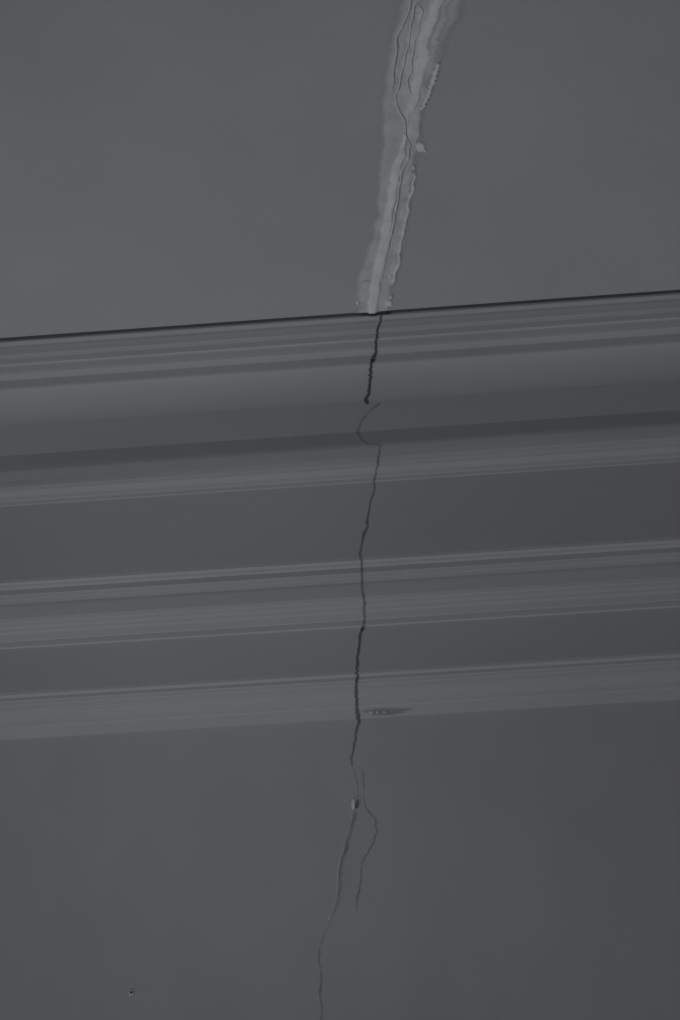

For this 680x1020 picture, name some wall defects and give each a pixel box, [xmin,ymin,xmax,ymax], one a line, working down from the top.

water stain [407,0,445,114]
water stain [368,135,416,314]
crack [364,312,390,404]
crack [355,627,364,723]